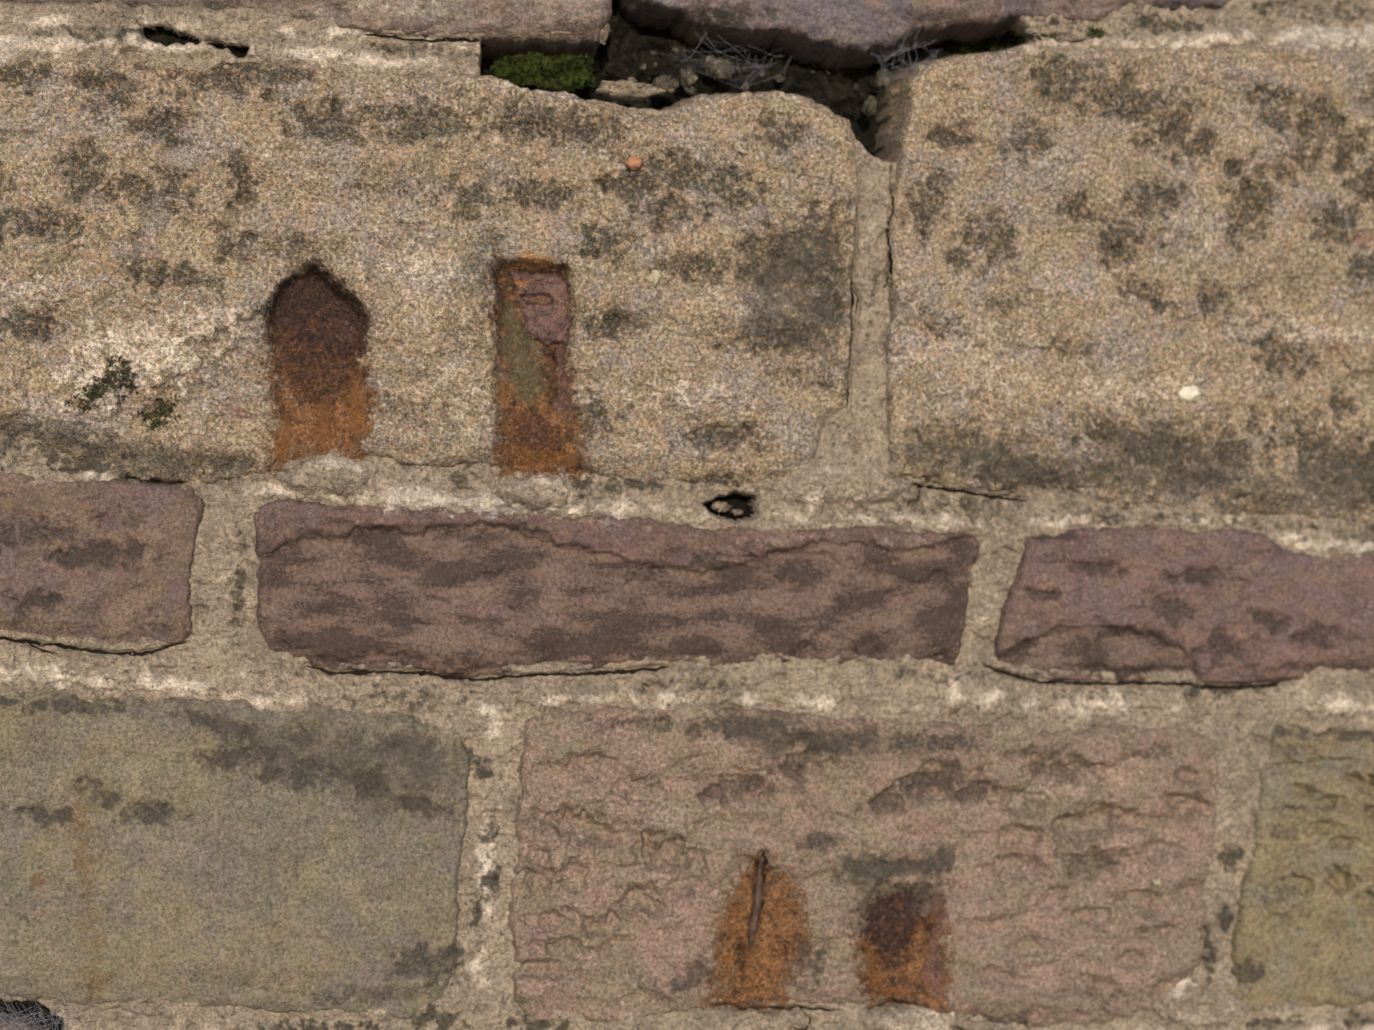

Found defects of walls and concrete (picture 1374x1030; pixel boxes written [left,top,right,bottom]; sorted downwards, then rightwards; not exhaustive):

corrosion [258,259,382,476]
corrosion [487,251,594,480]
crack [847,166,894,409]
corrosion [698,848,816,1014]
corrosion [850,886,957,1014]